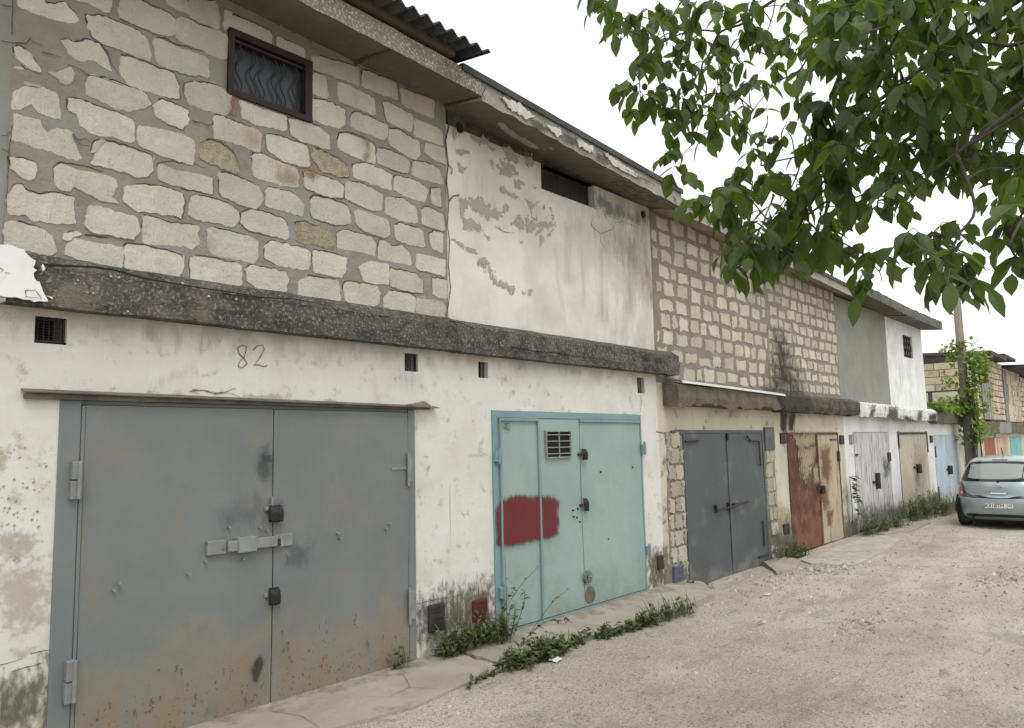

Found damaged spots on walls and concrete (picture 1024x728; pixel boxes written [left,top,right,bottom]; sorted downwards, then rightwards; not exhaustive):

peeling [500,96,535,120]
peeling [451,123,661,295]
crack [189,388,237,396]
damp [764,325,815,433]
corrosion [819,443,834,524]
damp [416,581,496,647]
damp [0,660,48,728]
corrosion [244,656,264,704]